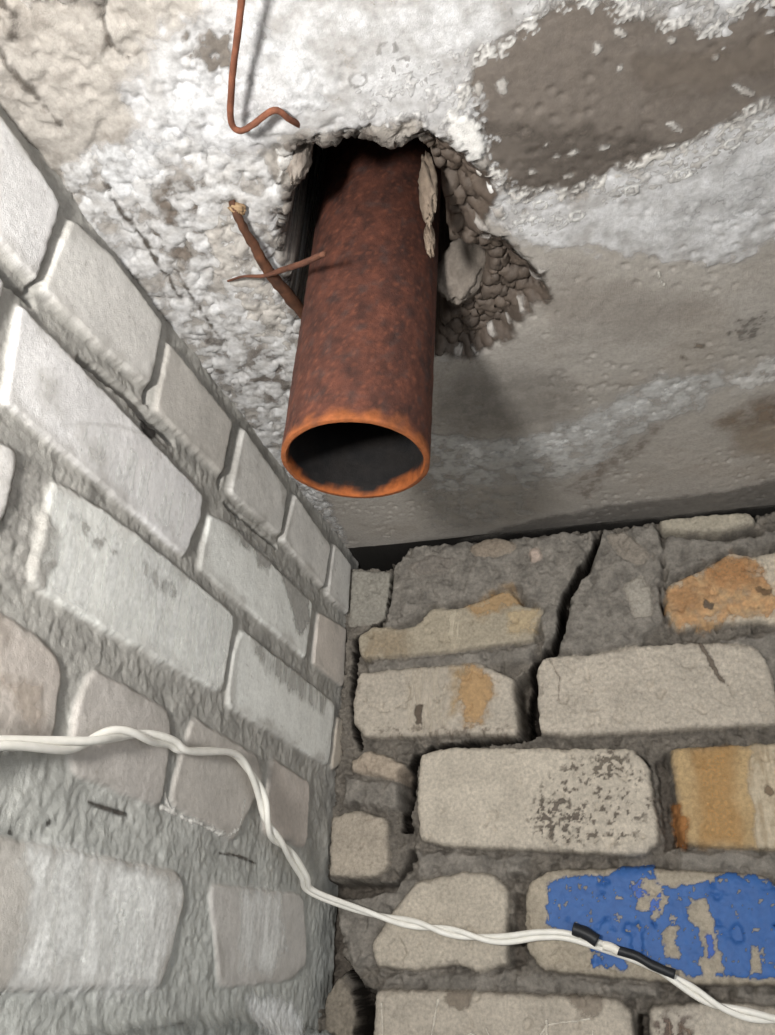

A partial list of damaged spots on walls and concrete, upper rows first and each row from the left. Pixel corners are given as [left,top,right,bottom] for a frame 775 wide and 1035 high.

spalling [273,113,552,359]
leakage [62,0,775,540]
crack [403,533,603,834]
peeling [545,865,775,980]